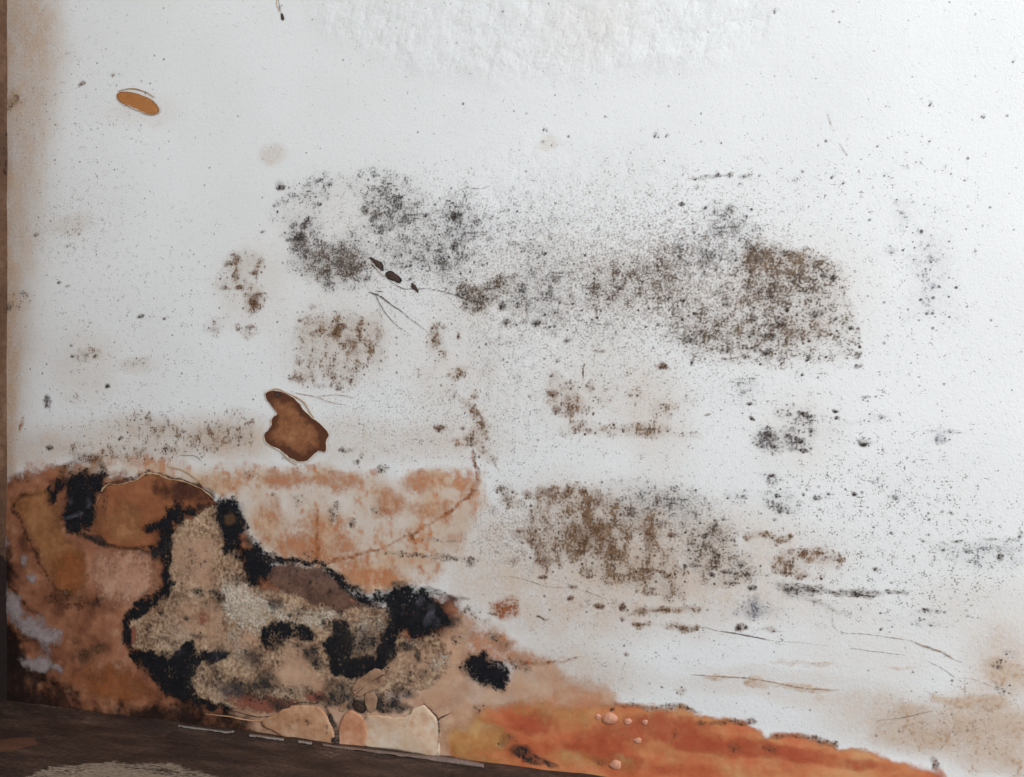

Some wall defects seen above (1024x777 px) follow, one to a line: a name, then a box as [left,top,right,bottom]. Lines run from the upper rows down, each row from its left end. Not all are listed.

peeling [116,88,160,115]
damp [274,167,862,369]
damp [288,306,385,391]
peeling [263,388,352,465]
peeling [83,455,217,552]
damp [5,364,950,777]
peeling [261,668,441,756]